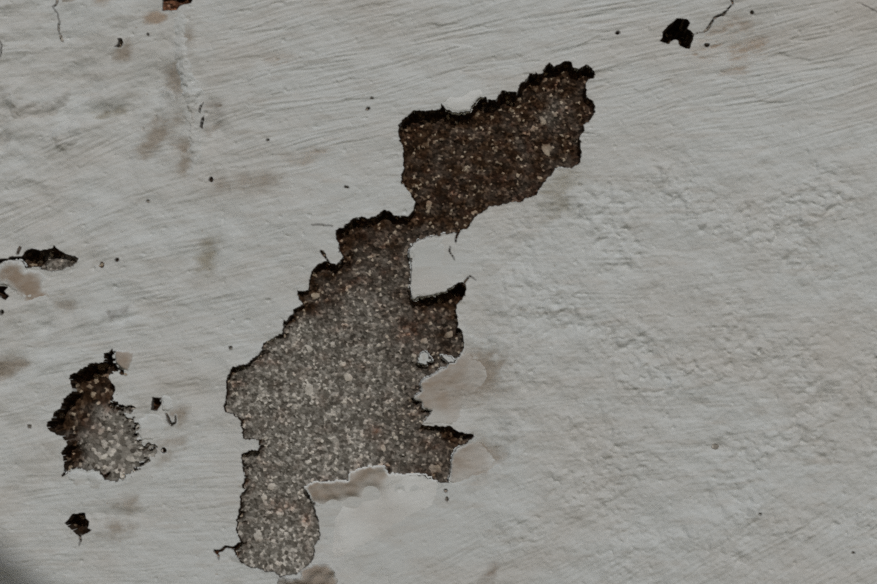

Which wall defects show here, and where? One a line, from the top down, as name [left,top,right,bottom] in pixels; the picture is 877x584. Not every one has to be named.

spalling [163,0,192,11]
crack [692,0,733,36]
spalling [661,23,691,48]
spalling [0,246,78,271]
spalling [215,64,594,584]
spalling [52,350,176,489]
spalling [69,513,90,541]